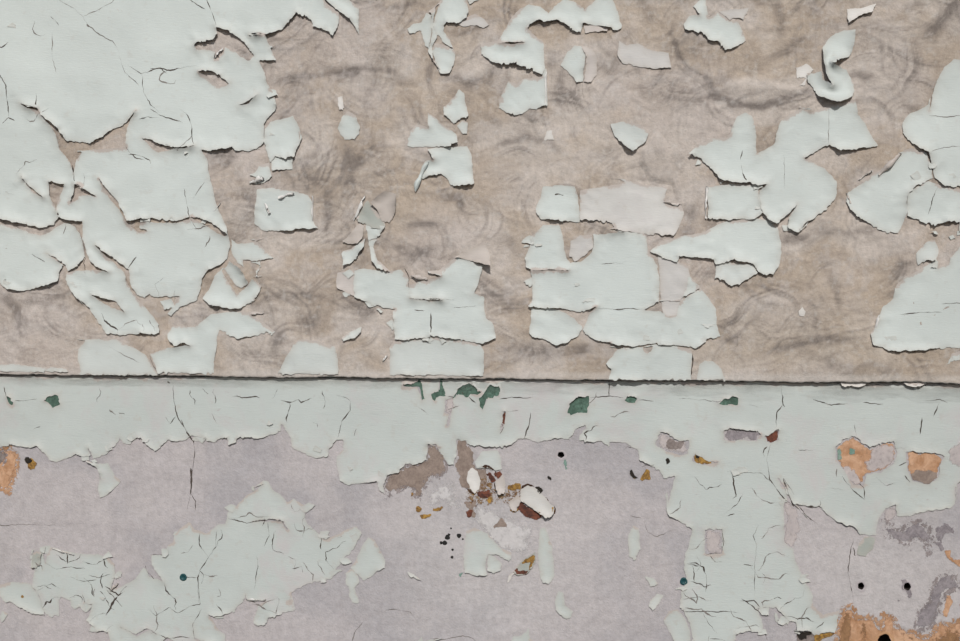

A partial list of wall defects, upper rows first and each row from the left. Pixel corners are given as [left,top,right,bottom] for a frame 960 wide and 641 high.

crack [0,75,45,123]
crack [32,0,195,163]
peeling [78,312,275,376]
peeling [0,0,360,335]
crack [101,313,356,508]
peeling [336,191,496,376]
peeling [522,101,878,382]
peeling [846,59,960,364]
crack [35,553,122,614]
crack [145,505,345,638]
peeling [0,376,960,641]
crack [683,399,945,640]